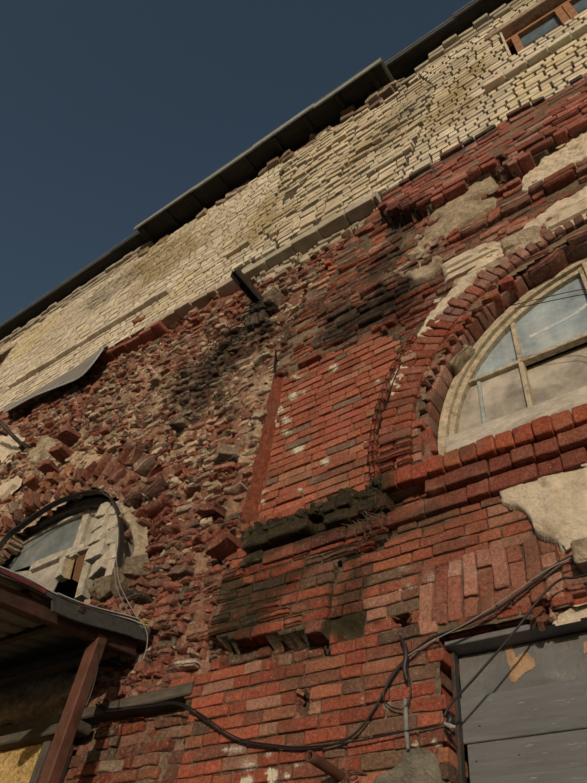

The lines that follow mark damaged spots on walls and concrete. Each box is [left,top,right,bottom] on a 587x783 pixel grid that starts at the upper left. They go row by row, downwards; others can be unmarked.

peeling [521,132,587,200]
peeling [393,155,508,282]
peeling [522,186,587,230]
peeling [417,248,504,338]
damp [164,326,251,423]
damp [275,406,293,436]
spalling [0,216,370,707]
peeling [499,463,587,555]
peeling [504,645,535,683]
damp [222,746,258,783]
damp [265,763,301,783]